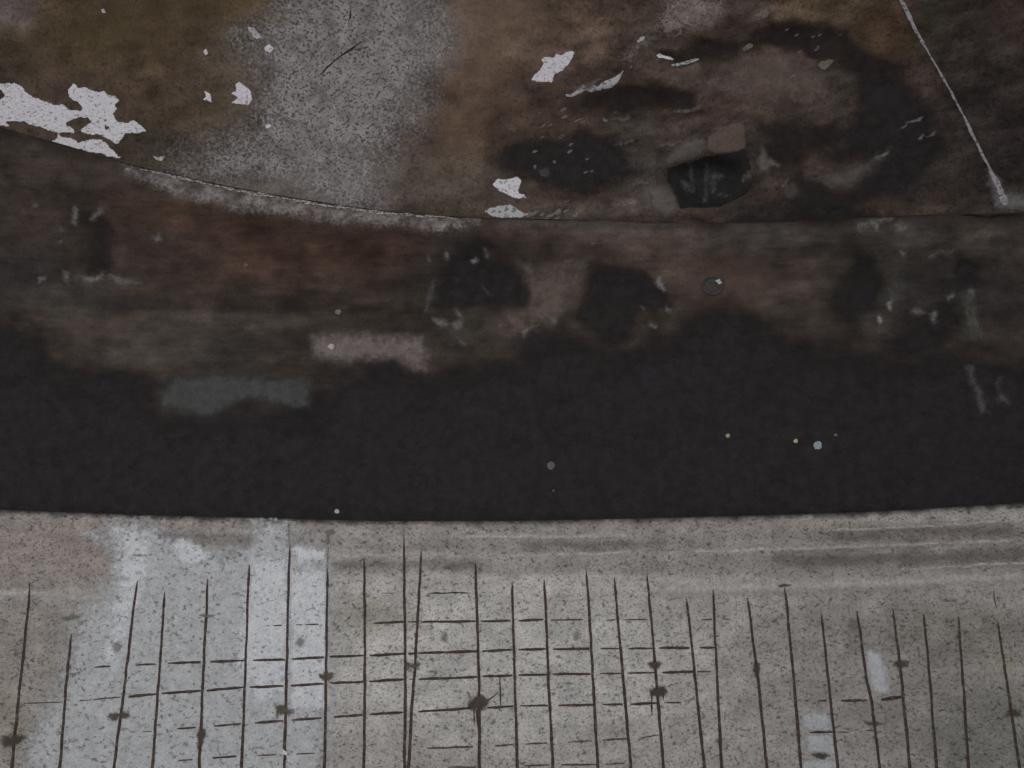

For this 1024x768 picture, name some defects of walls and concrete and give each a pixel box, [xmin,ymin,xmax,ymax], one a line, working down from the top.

peeling [531,51,574,83]
peeling [538,0,722,154]
peeling [0,83,146,158]
crack [899,0,1024,218]
peeling [485,177,578,219]
flaking render [649,186,677,216]
corrosion [468,691,499,727]